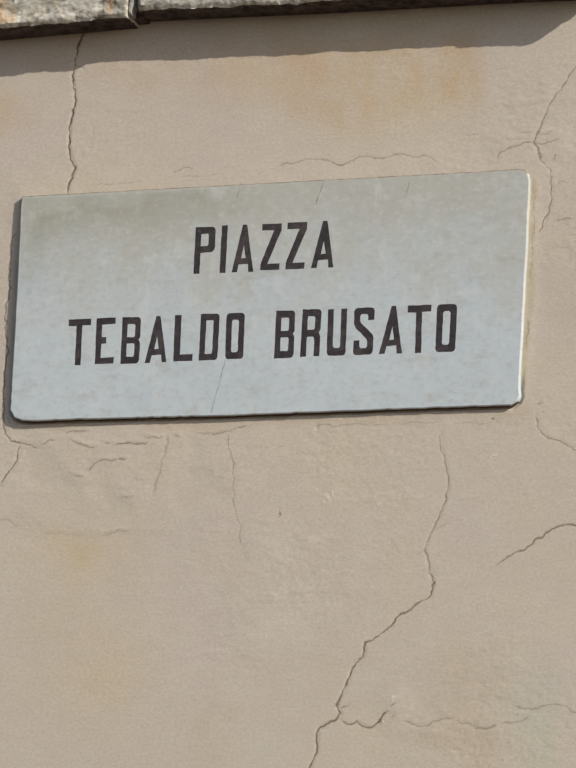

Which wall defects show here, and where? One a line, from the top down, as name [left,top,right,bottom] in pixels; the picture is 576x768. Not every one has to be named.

crack [67,33,84,191]
crack [534,77,569,230]
crack [2,235,31,482]
crack [504,524,576,560]
crack [309,572,435,768]